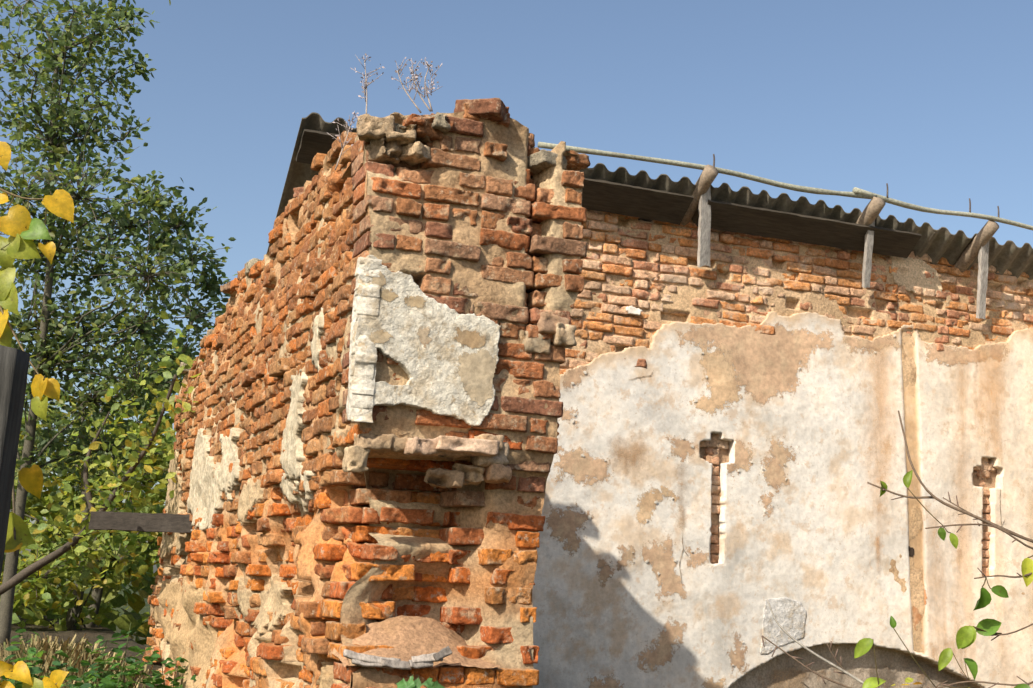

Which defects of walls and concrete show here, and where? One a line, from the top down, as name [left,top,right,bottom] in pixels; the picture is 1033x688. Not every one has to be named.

spalling [371,271,426,309]
spalling [417,327,432,350]
spalling [454,327,496,408]
peeling [562,365,589,391]
peeling [546,503,593,556]